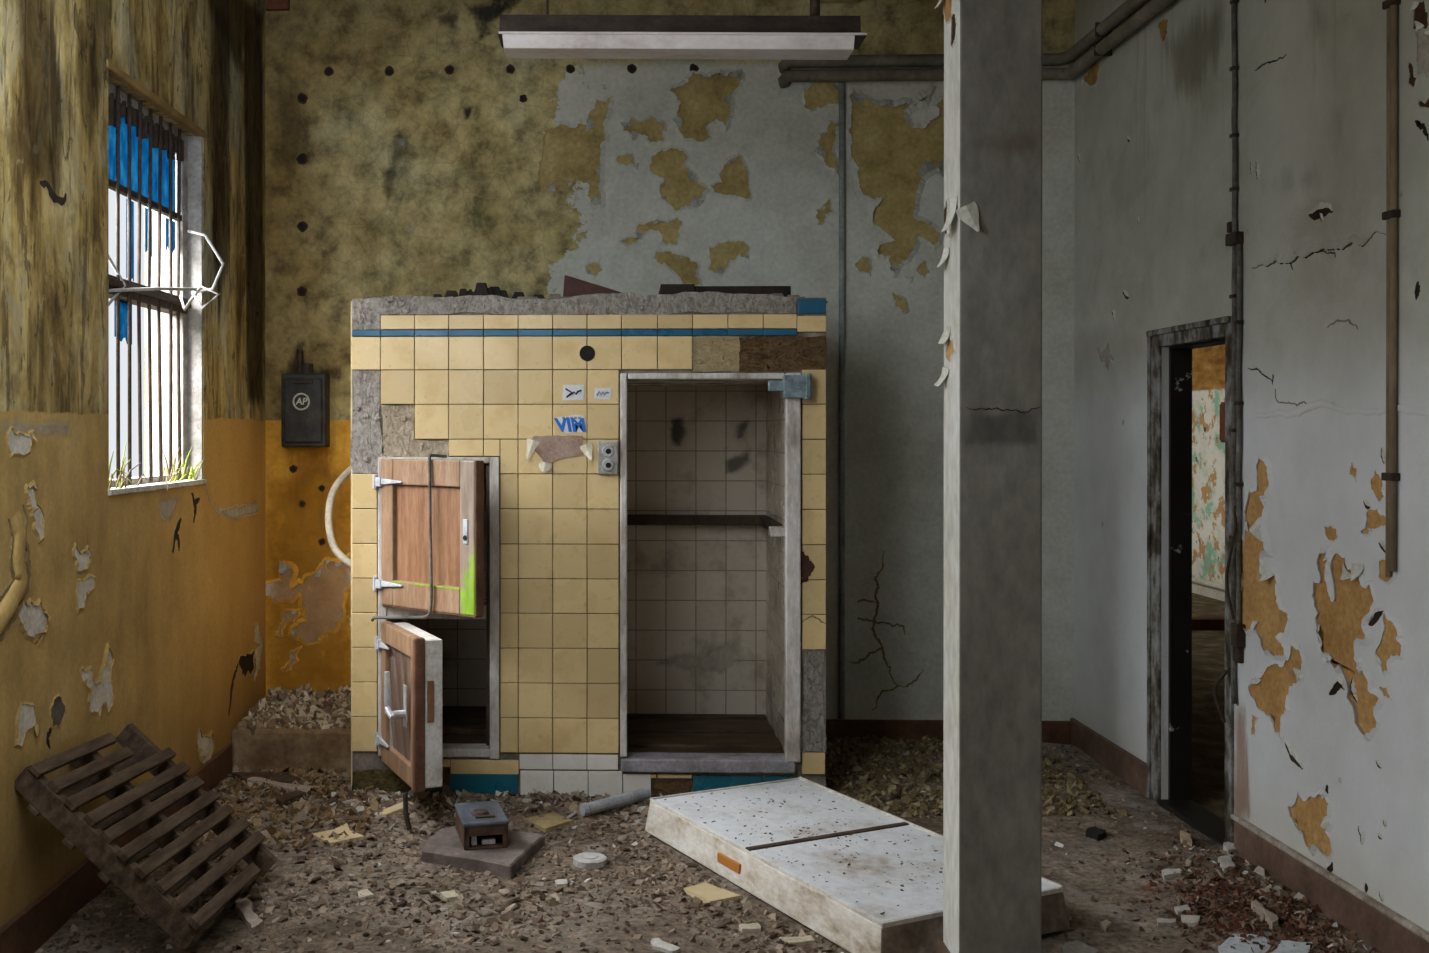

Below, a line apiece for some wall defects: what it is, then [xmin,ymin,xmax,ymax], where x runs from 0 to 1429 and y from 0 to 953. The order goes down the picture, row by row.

water stain [23,0,60,188]
water stain [208,0,263,403]
peeling [352,69,805,330]
peeling [801,82,950,315]
crack [1252,229,1386,270]
peeling [692,335,827,373]
flaking render [16,597,51,648]
peeling [238,552,351,684]
crack [803,553,924,711]
peeling [1241,448,1406,768]
flaking render [14,694,66,750]
peeling [1287,777,1342,869]